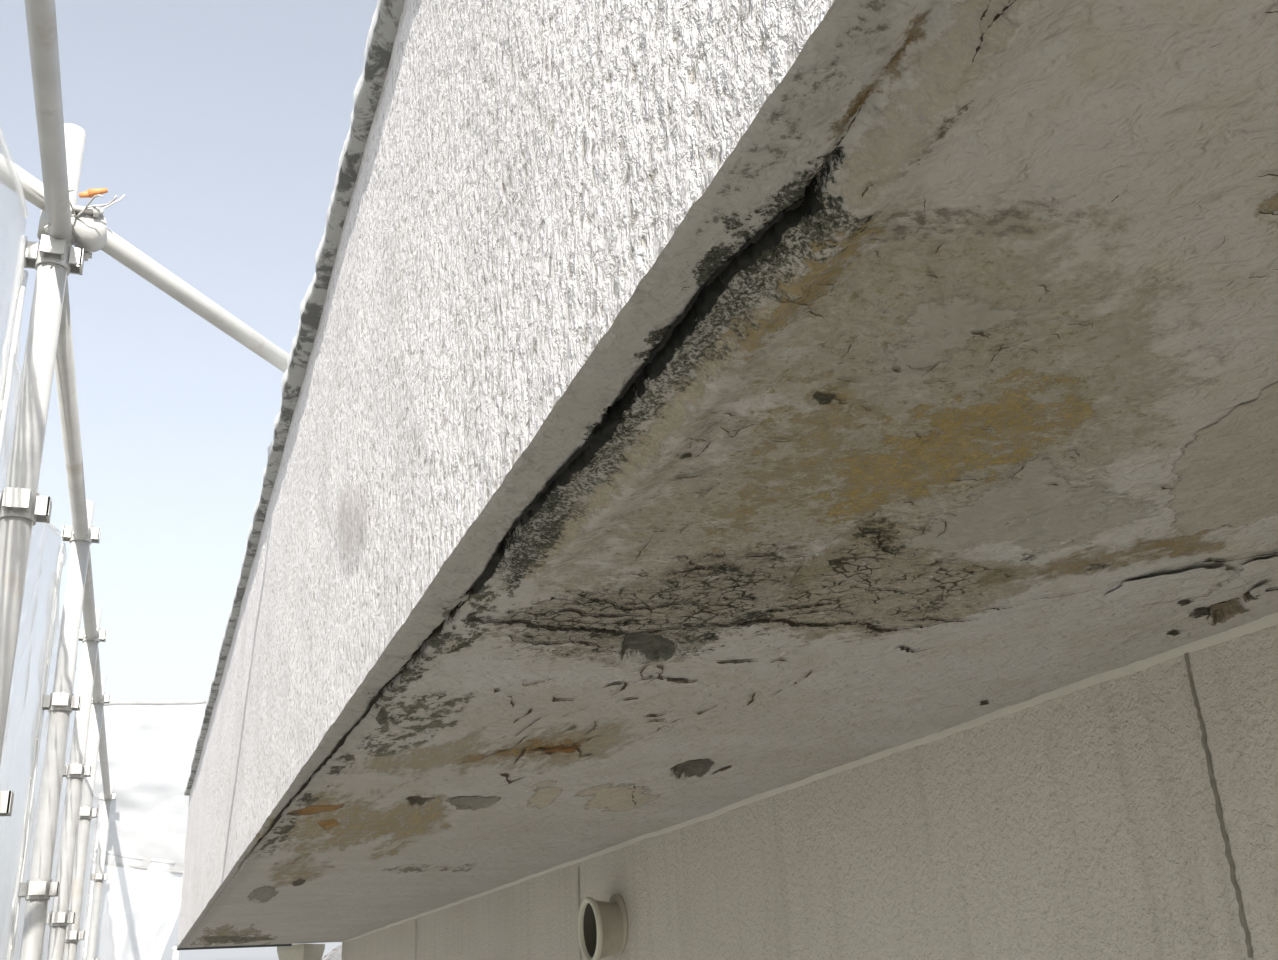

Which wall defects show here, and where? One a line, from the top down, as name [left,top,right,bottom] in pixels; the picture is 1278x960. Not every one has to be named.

crack [972,0,1016,63]
water stain [721,0,888,195]
water stain [910,105,968,165]
crack [971,275,1093,362]
crack [254,106,1037,847]
water stain [328,147,1095,787]
peeling [1029,552,1278,626]